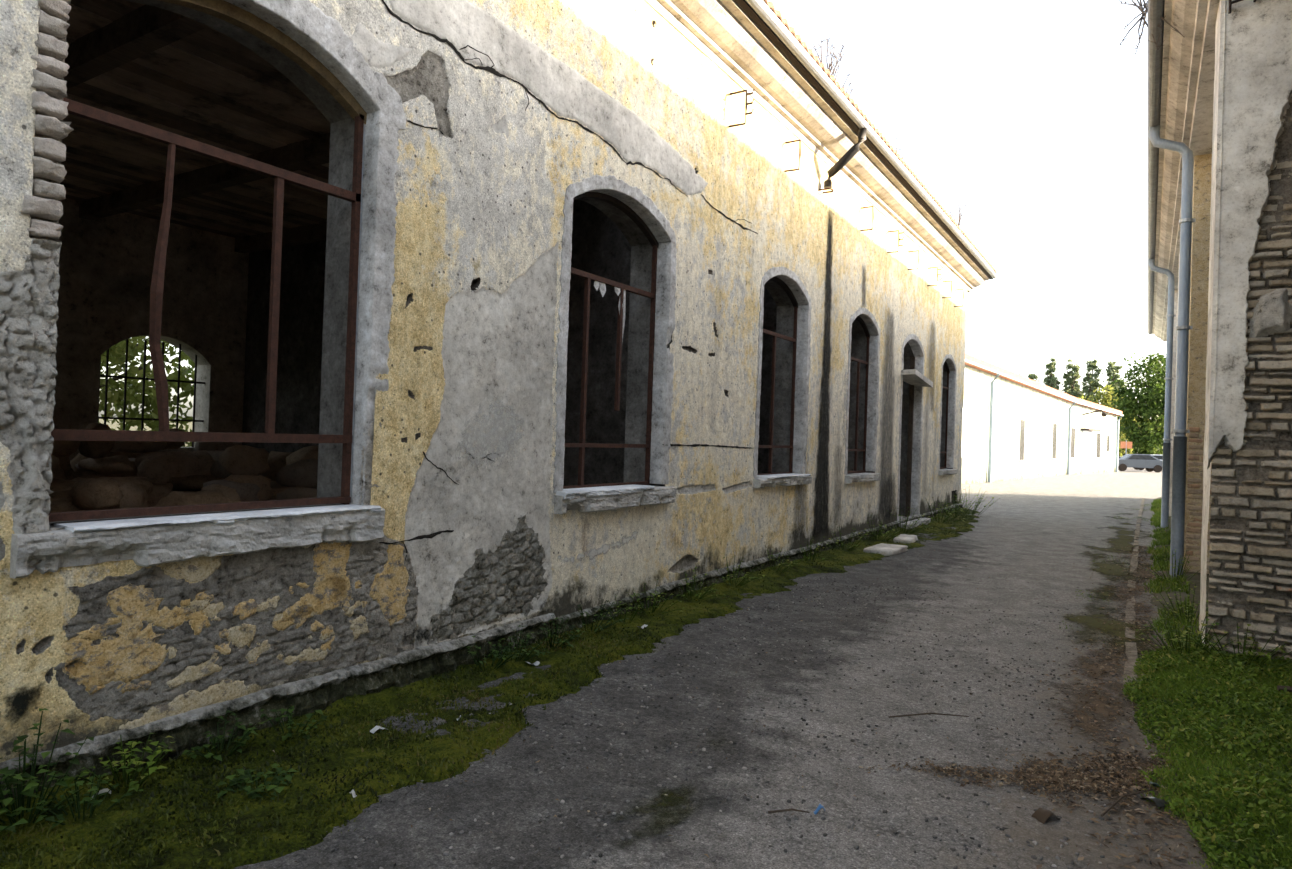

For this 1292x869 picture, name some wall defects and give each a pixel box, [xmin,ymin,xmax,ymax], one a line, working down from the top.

spalling [0,0,74,531]
peeling [16,242,559,730]
crack [379,530,454,560]
crack [382,0,758,234]
water stain [794,215,848,539]
spalling [1185,161,1292,661]